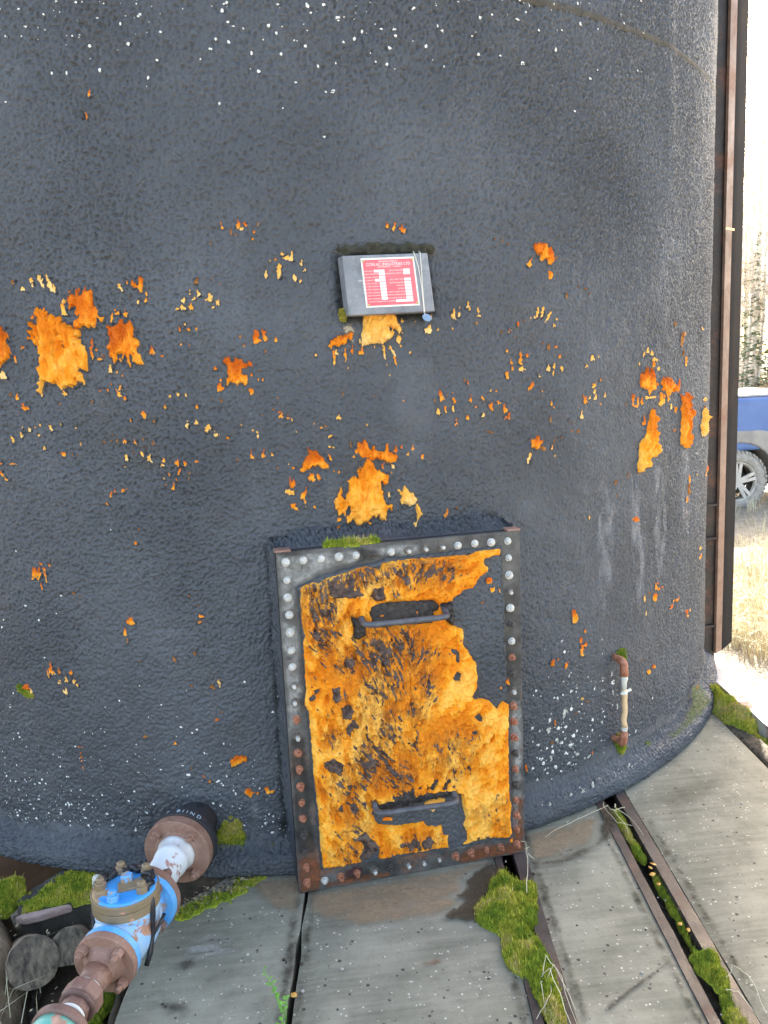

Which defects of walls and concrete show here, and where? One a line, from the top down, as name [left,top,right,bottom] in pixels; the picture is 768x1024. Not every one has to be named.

peeling [526,240,558,280]
peeling [0,272,164,412]
peeling [212,328,278,402]
peeling [313,313,439,376]
peeling [614,347,712,496]
peeling [236,413,430,529]
peeling [685,464,709,503]